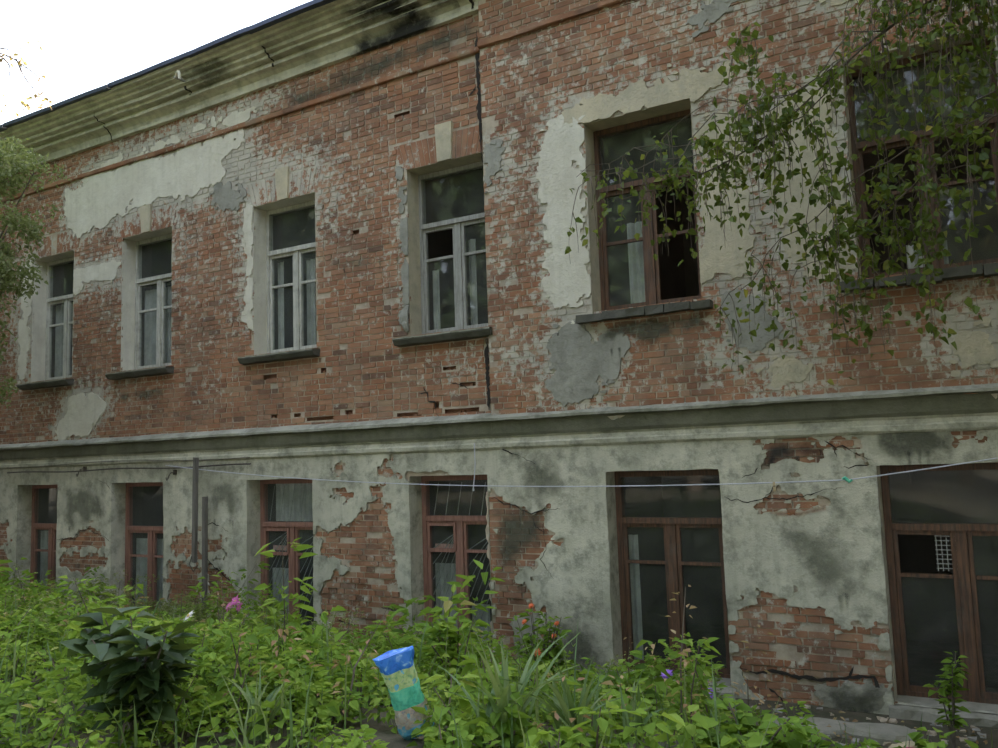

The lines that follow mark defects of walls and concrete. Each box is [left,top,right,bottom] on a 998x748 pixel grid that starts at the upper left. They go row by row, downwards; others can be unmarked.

peeling [64,106,262,331]
peeling [483,139,505,194]
peeling [536,60,733,309]
peeling [695,70,855,397]
peeling [544,320,631,409]
spalling [753,436,862,464]
spalling [0,522,12,581]
spalling [57,522,108,576]
spalling [166,528,243,613]
spalling [316,457,405,643]
spalling [485,492,563,666]
spalling [728,591,898,706]